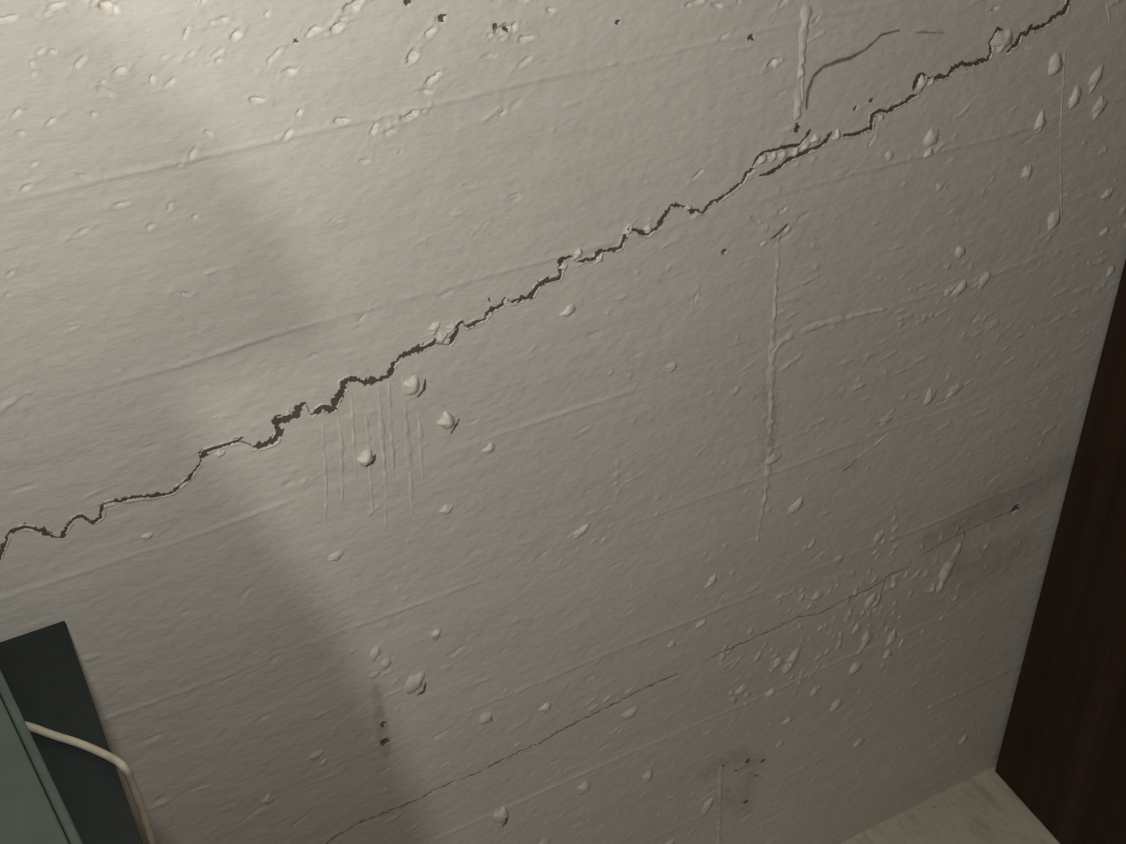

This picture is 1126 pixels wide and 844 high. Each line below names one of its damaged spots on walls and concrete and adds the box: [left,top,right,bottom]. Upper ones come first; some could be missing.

crack [0,0,1070,562]
crack [705,510,1012,662]
crack [326,674,676,844]